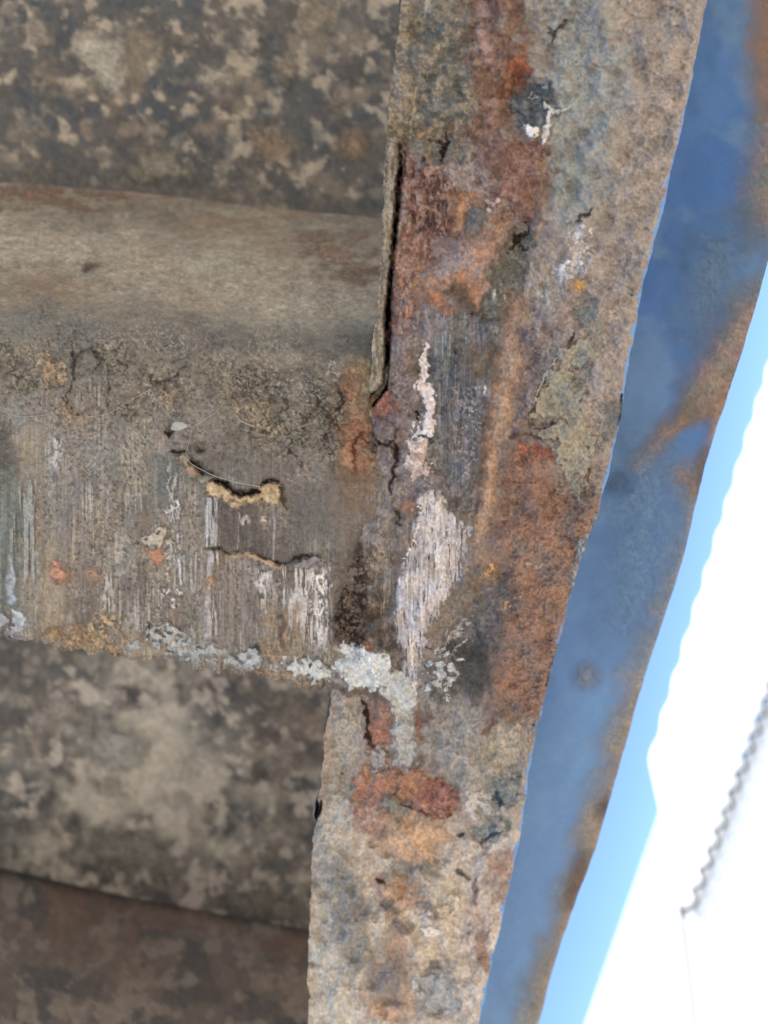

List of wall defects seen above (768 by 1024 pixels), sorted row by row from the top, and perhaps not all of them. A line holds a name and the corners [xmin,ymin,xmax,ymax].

corrosion [386,0,557,342]
crack [383,150,406,379]
crack [61,346,186,416]
crack [173,450,287,510]
crack [204,546,325,569]
corrosion [335,366,379,504]
crack [387,442,402,526]
damp [398,496,473,667]
corrosion [471,292,601,731]
crack [361,688,388,753]
corrosion [350,700,462,965]